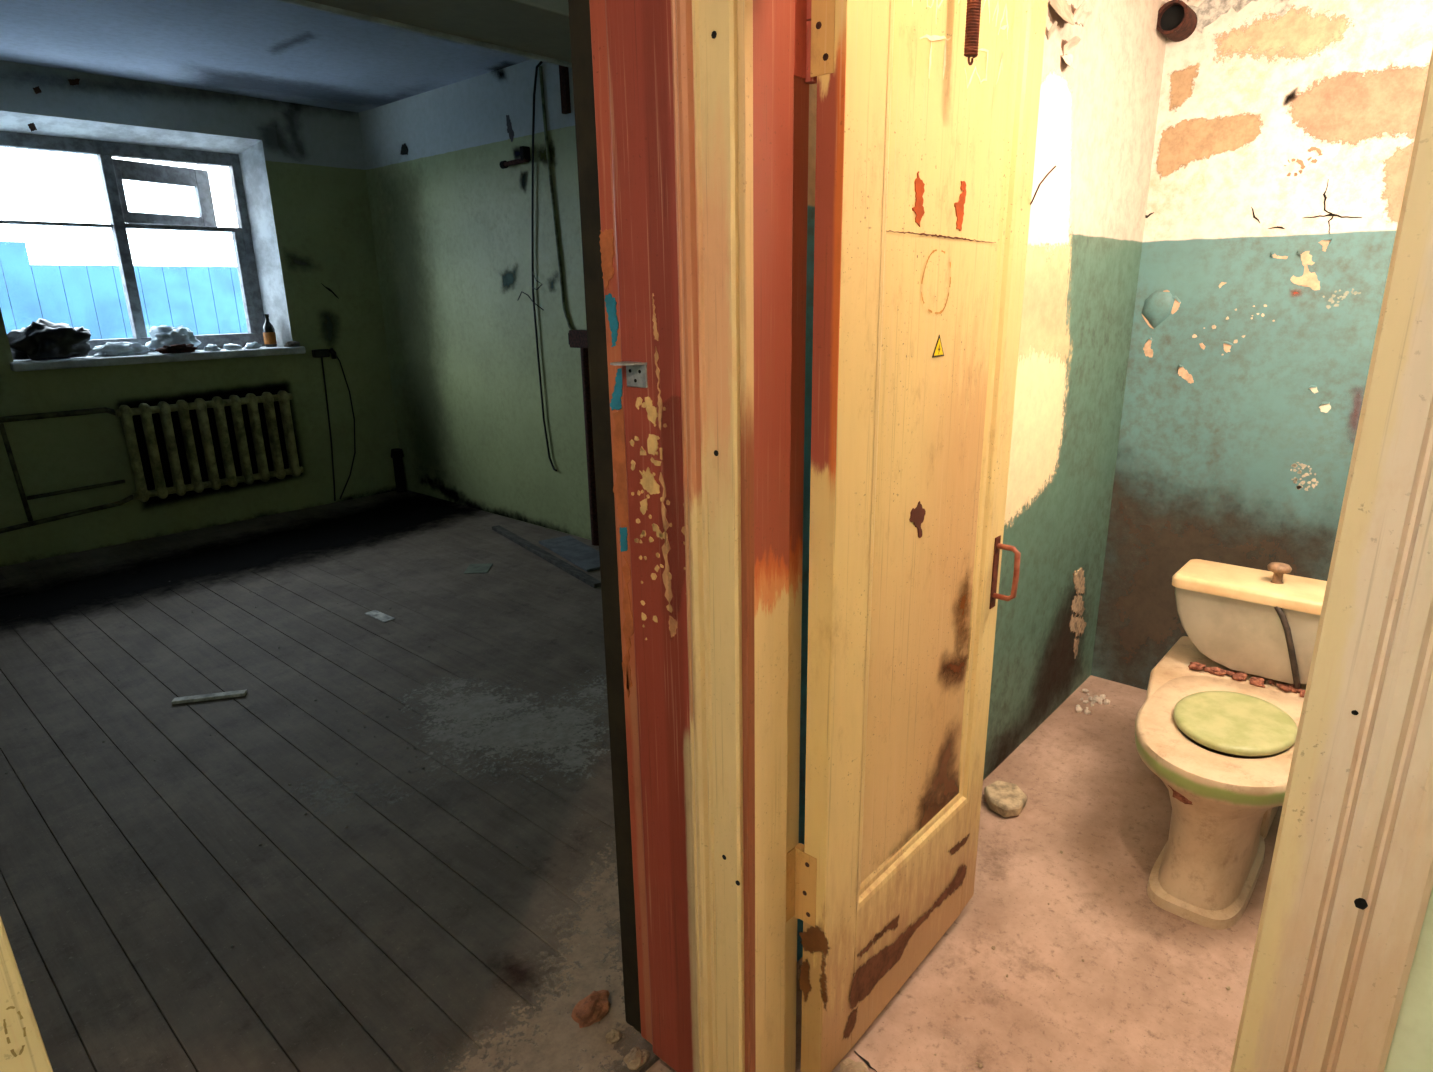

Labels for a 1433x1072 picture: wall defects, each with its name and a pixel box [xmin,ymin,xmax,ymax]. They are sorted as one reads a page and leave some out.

peeling [1045,0,1092,72]
spalling [1188,0,1295,33]
crack [1251,179,1362,234]
peeling [599,229,619,347]
peeling [1271,237,1332,290]
peeling [1143,337,1153,358]
peeling [1178,365,1194,384]
peeling [1308,385,1331,413]
peeling [610,293,678,698]
leakage [1290,462,1319,491]
spalling [1070,567,1087,657]
leakage [991,472,1334,773]